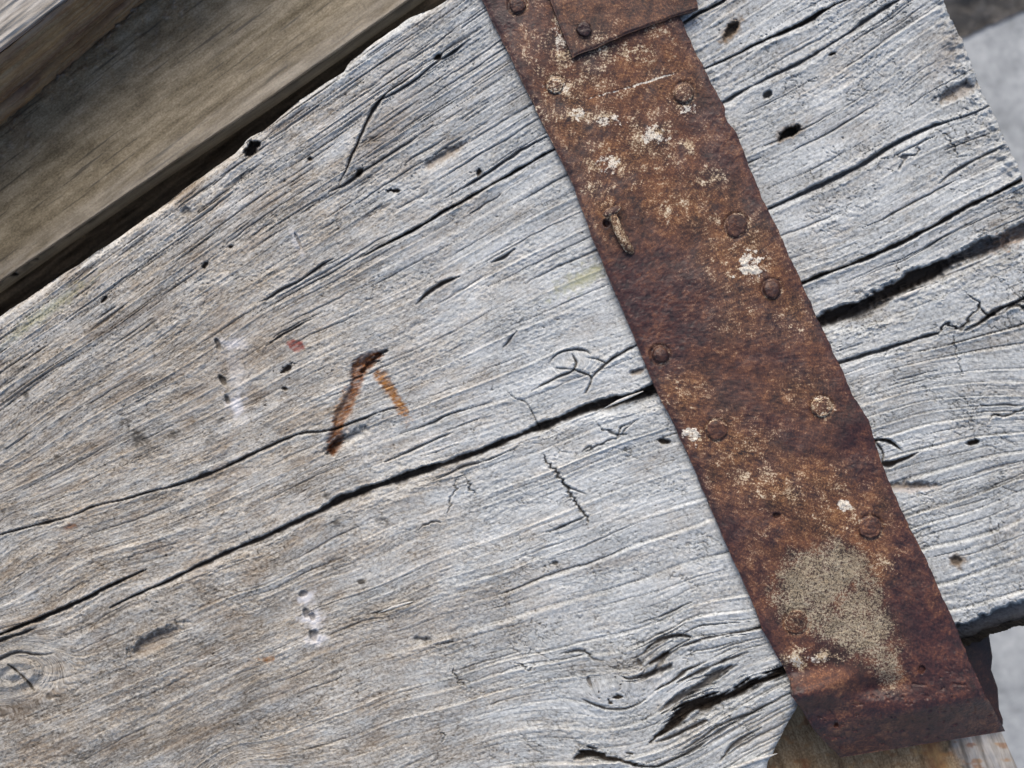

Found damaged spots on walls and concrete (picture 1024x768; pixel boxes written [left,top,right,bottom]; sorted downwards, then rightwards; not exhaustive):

crack [327,38,472,194]
crack [801,176,1024,377]
rust [987,212,1024,236]
rust [323,347,420,458]
crack [0,343,665,694]
rust [515,527,722,590]
crack [432,721,447,744]
crack [513,625,790,768]